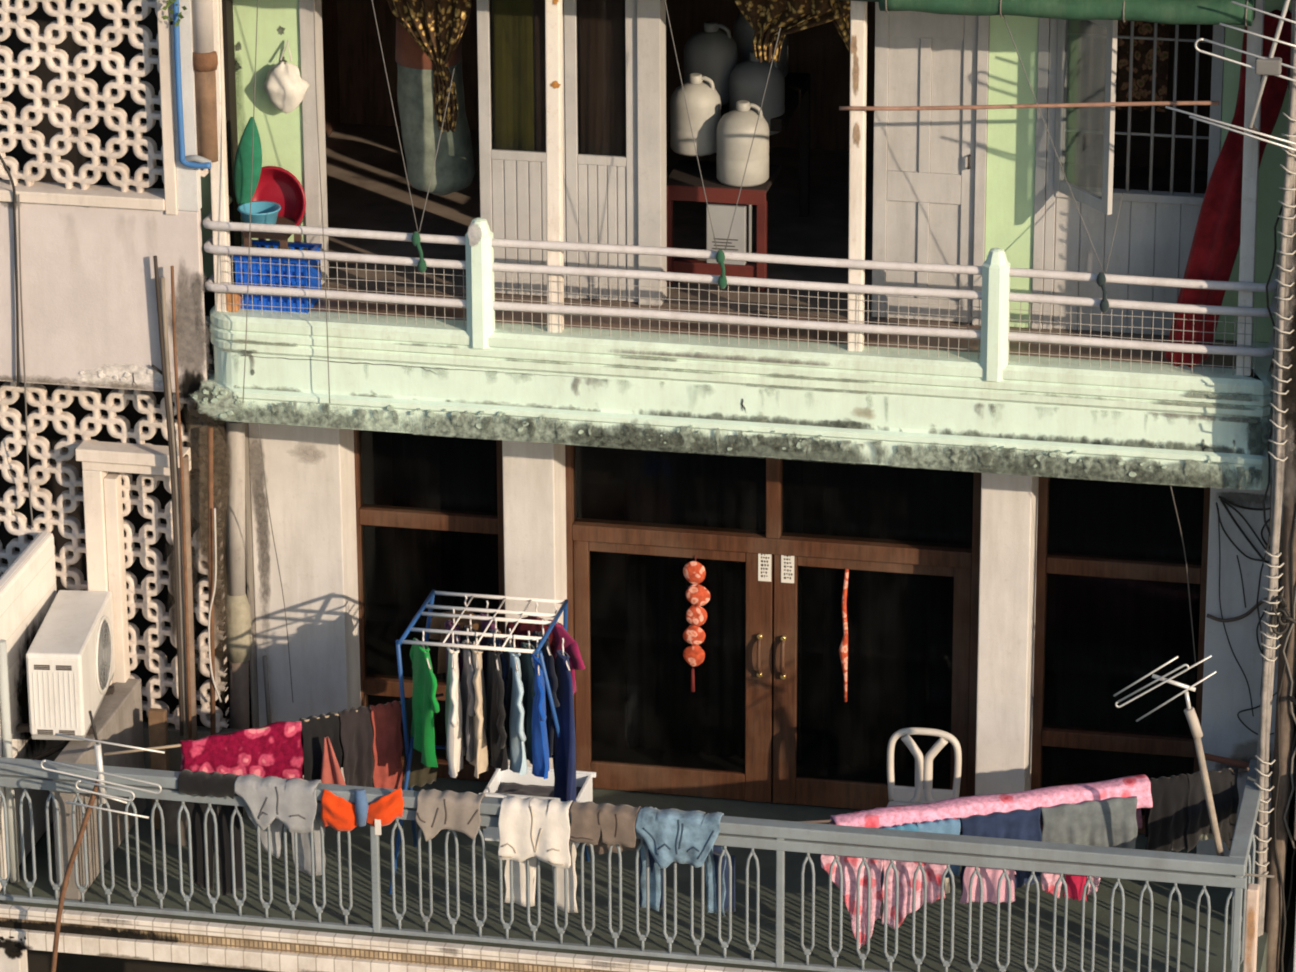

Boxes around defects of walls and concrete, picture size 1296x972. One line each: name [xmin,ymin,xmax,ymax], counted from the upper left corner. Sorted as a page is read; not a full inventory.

water stain [186,232,1296,651]